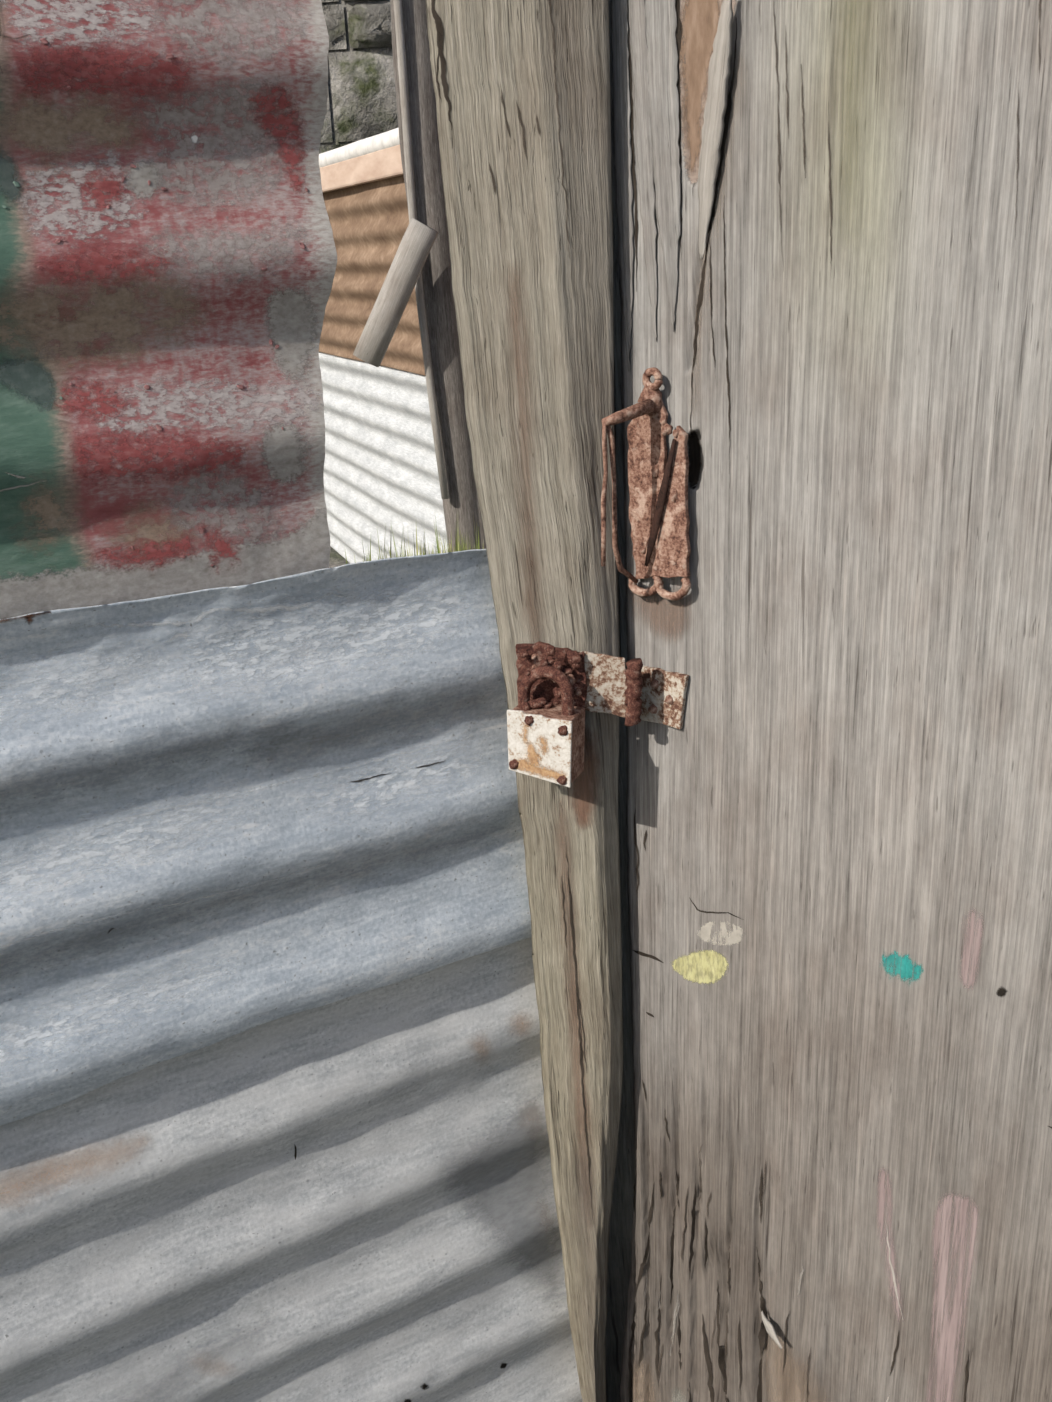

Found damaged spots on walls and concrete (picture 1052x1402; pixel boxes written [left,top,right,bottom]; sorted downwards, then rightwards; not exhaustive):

peeling [157,0,305,60]
peeling [85,162,164,211]
peeling [249,85,308,192]
crack [628,24,638,292]
crack [676,0,737,451]
crack [773,4,832,260]
peeling [0,358,311,488]
rust [659,416,679,438]
peeling [96,525,239,570]
rust [521,645,582,711]
rust [573,733,595,824]